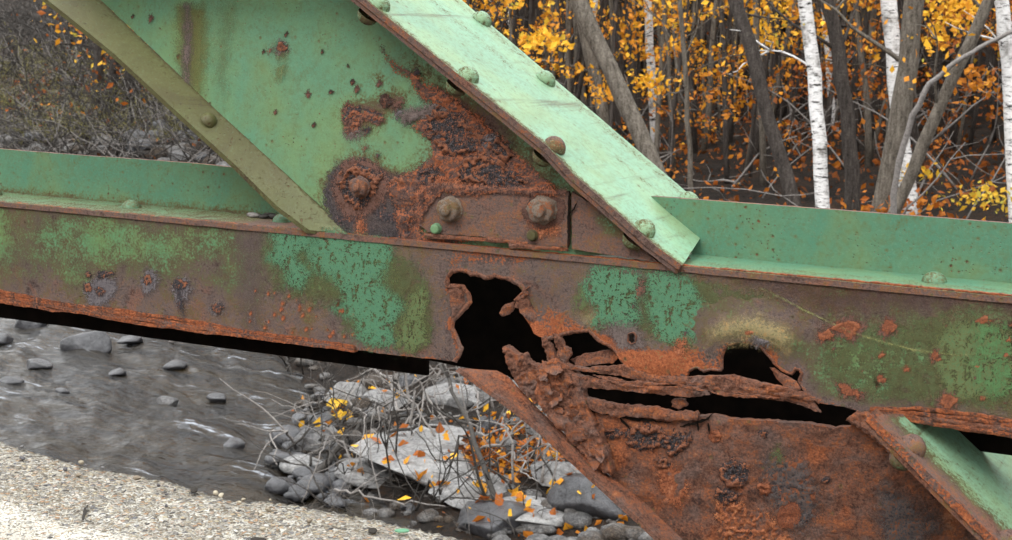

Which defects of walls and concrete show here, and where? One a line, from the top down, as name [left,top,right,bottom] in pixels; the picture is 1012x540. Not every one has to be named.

corrosion [321,46,567,243]
corrosion [82,270,120,306]
corrosion [137,264,194,318]
peeling [499,301,516,316]
peeling [570,349,618,366]
corrosion [605,312,647,352]
peeling [570,264,769,359]
corrosion [813,313,900,358]
corrosion [502,333,822,512]
corrosion [834,373,890,453]
corrosion [712,430,831,540]
corrosion [868,473,952,540]